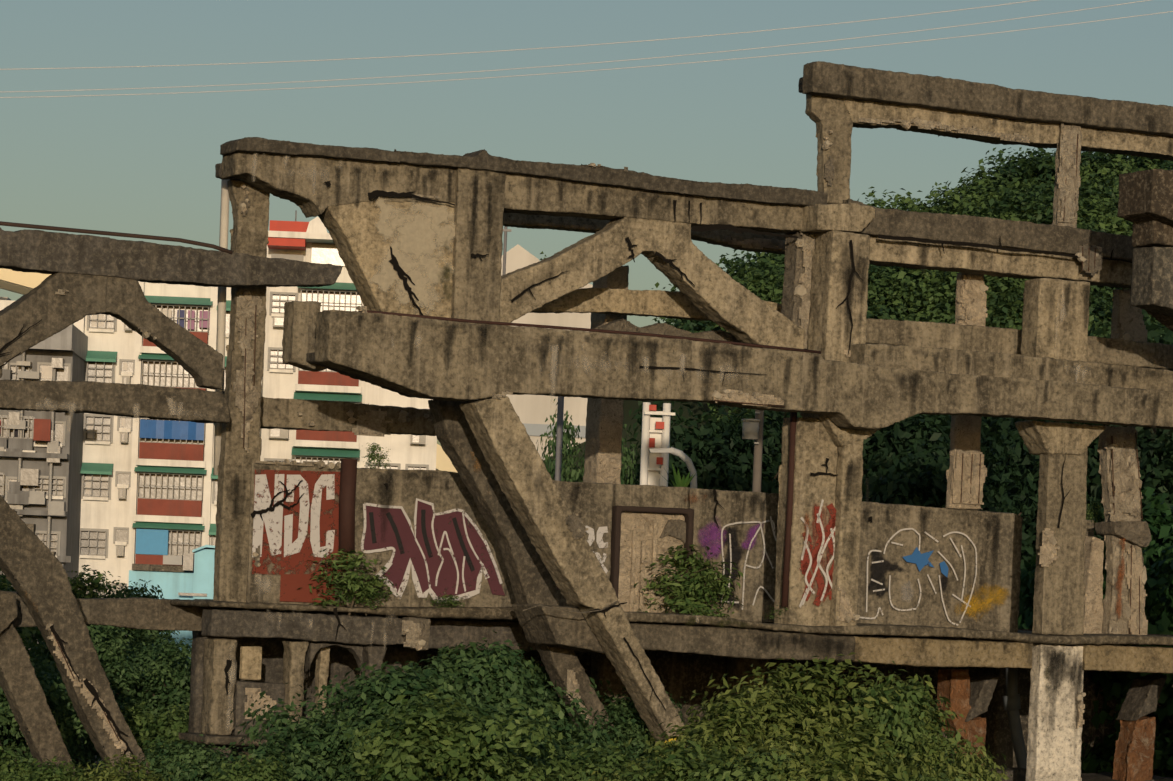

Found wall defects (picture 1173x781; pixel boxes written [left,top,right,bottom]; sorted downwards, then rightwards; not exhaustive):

crack [389,246,423,315]
crack [836,234,1132,355]
spalling [1038,528,1060,567]
spalling [46,623,137,772]
crack [589,602,666,710]